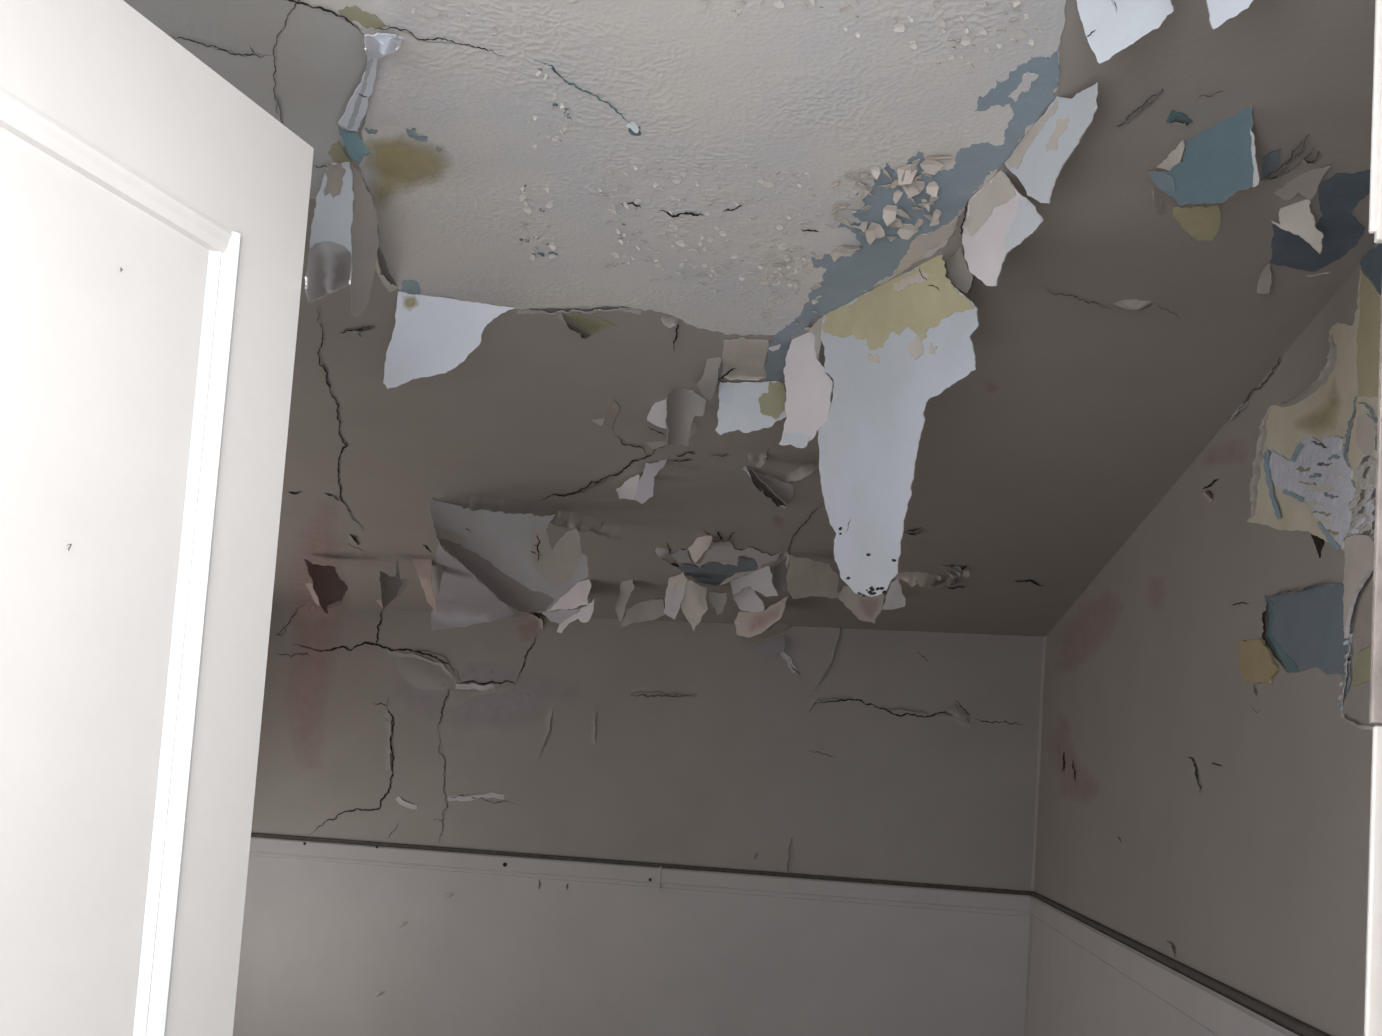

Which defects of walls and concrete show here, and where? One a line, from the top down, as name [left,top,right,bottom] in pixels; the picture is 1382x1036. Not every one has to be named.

crack [168,0,631,124]
peeling [1206,0,1253,29]
crack [288,310,377,531]
peeling [300,0,1174,641]
peeling [1117,89,1382,712]
crack [276,603,536,842]
crack [779,651,1019,729]